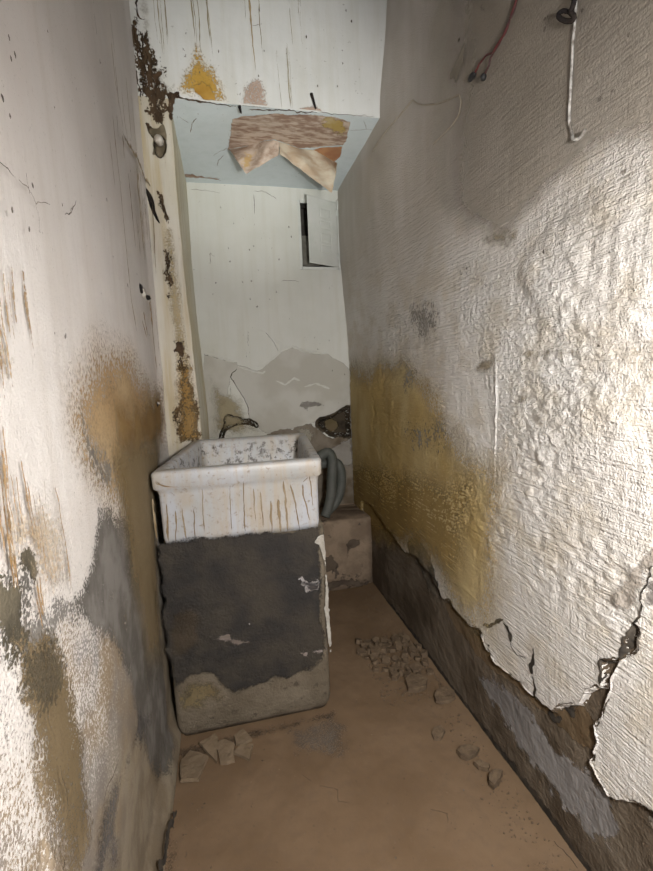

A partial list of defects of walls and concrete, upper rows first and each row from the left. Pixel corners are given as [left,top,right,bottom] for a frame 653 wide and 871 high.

crack [0,162,76,232]
corrosion [0,271,35,398]
damp [411,302,438,338]
corrosion [0,429,71,628]
peeling [203,346,354,507]
damp [349,361,497,625]
damp [0,547,120,871]
flaking render [371,525,653,871]
crack [597,566,653,688]